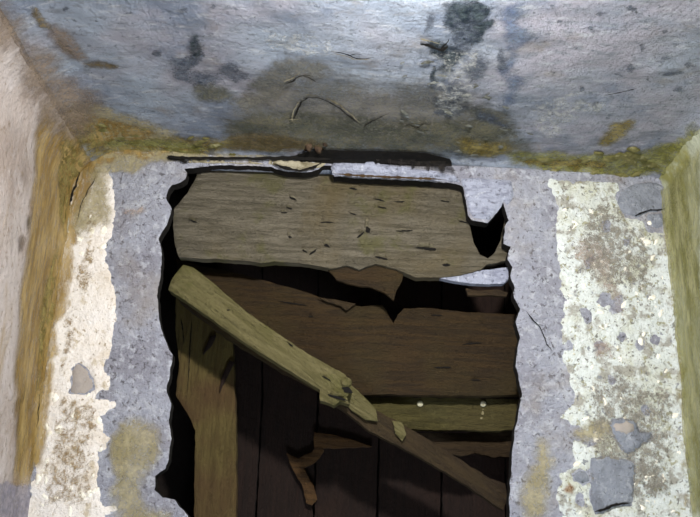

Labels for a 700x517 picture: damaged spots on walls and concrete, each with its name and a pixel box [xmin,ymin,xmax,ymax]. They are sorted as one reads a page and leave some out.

crack [284,74,390,128]
water stain [171,0,533,172]
water stain [0,7,118,485]
crack [67,173,95,231]
peeling [459,178,514,223]
water stain [113,420,168,517]